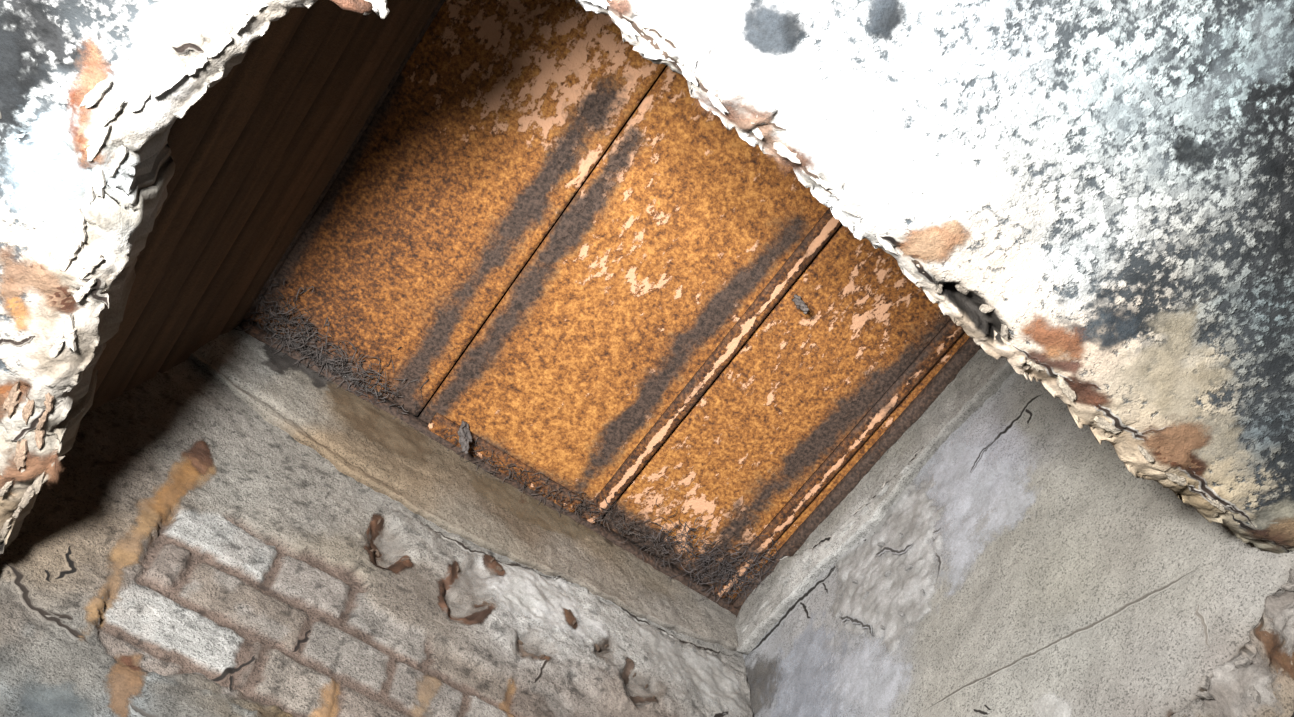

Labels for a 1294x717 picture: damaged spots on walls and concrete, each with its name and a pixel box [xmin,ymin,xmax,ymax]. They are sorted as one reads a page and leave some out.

peeling [584,0,729,116]
mould [868,0,903,39]
peeling [49,1,268,358]
rust [700,98,813,171]
mould [1175,136,1216,173]
rust [898,220,969,262]
spalling [934,280,1009,344]
rust [1022,318,1109,406]
mould [1072,292,1140,349]
crack [970,346,1169,473]
crack [1177,466,1294,553]
crack [0,541,90,644]